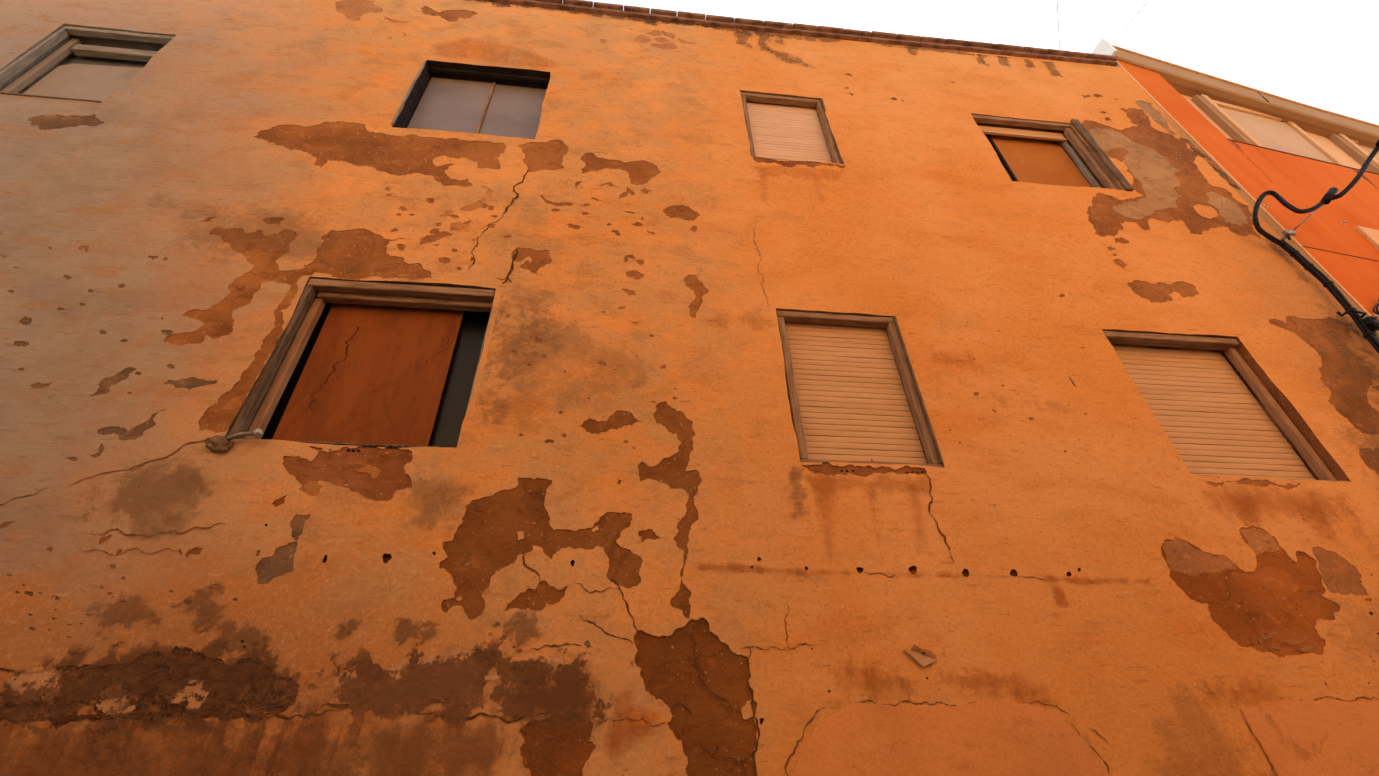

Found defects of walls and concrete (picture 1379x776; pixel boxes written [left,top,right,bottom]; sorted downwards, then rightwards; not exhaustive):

peeling [13,316,32,347]
peeling [90,367,141,396]
peeling [161,121,661,433]
crack [469,169,528,284]
peeling [663,205,700,232]
peeling [683,274,709,318]
spalling [1070,94,1262,303]
peeling [1269,315,1379,476]
peeling [4,388,764,776]
crack [926,474,955,562]
spalling [1161,525,1373,658]
crack [595,603,824,776]